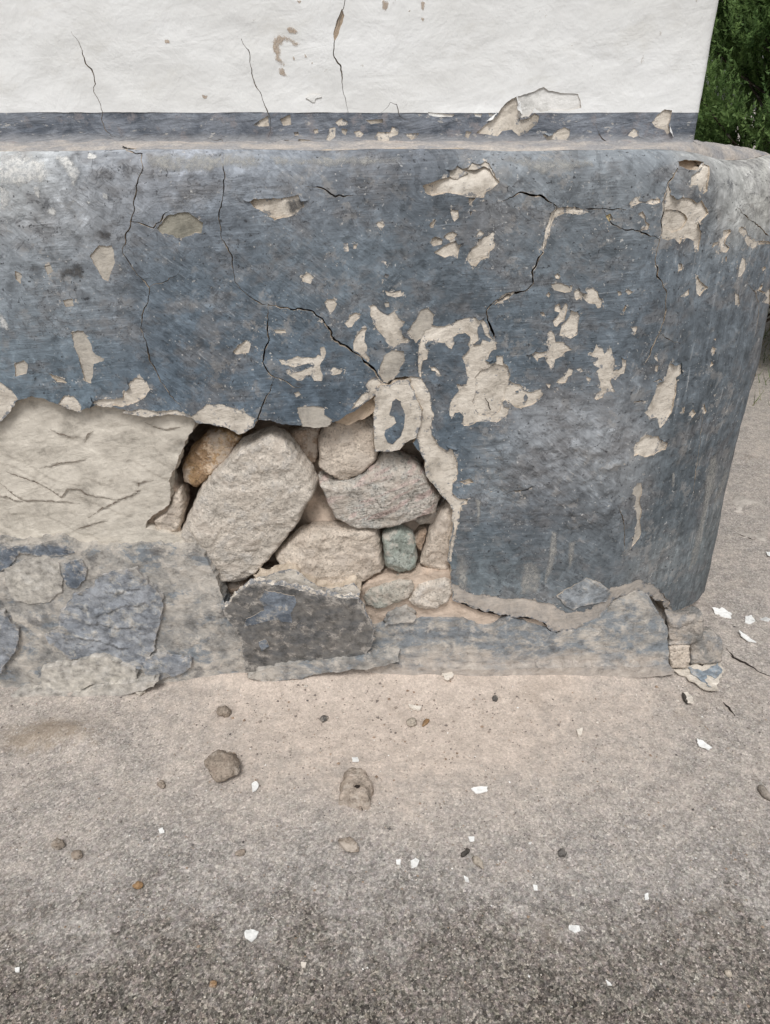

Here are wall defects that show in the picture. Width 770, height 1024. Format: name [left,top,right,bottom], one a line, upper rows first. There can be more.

crack [333,2,348,109]
peeling [465,87,581,140]
crack [74,36,180,399]
peeling [423,161,499,266]
peeling [629,160,708,249]
crack [218,167,382,420]
crack [0,429,153,529]
peeling [279,290,627,562]
peeling [634,355,705,457]
flaking render [0,378,258,698]
flaking render [223,561,417,682]
peeling [451,578,671,632]